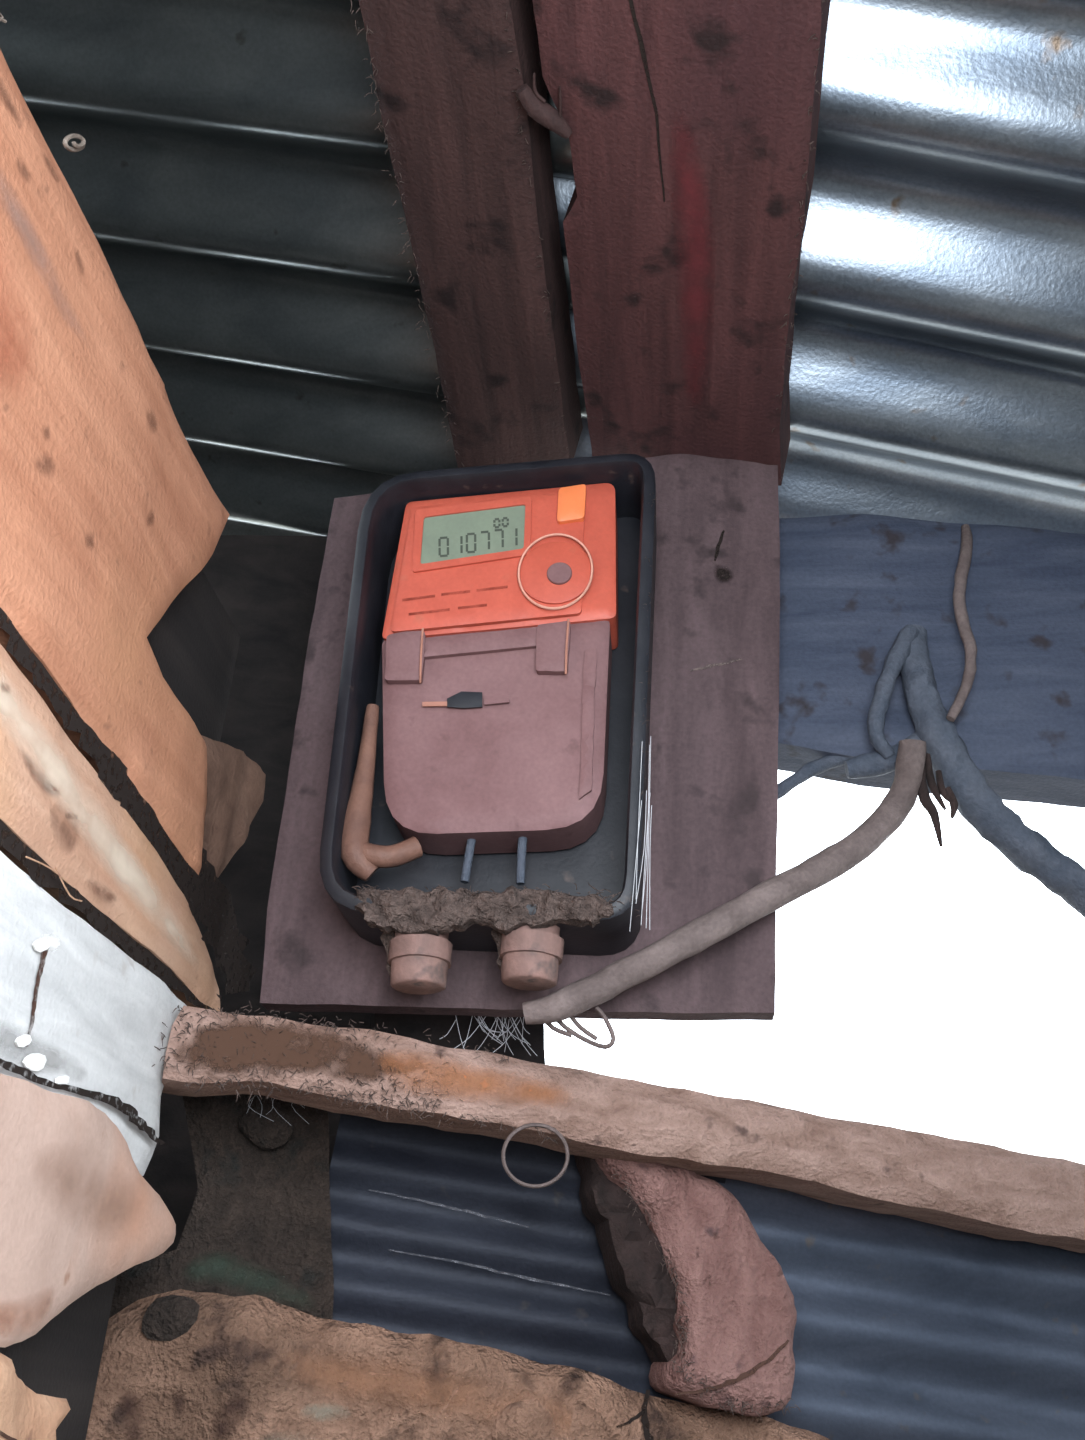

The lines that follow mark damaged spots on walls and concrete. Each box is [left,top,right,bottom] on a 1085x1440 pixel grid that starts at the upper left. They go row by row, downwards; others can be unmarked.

crack [629,0,665,202]
crack [616,1340,789,1440]